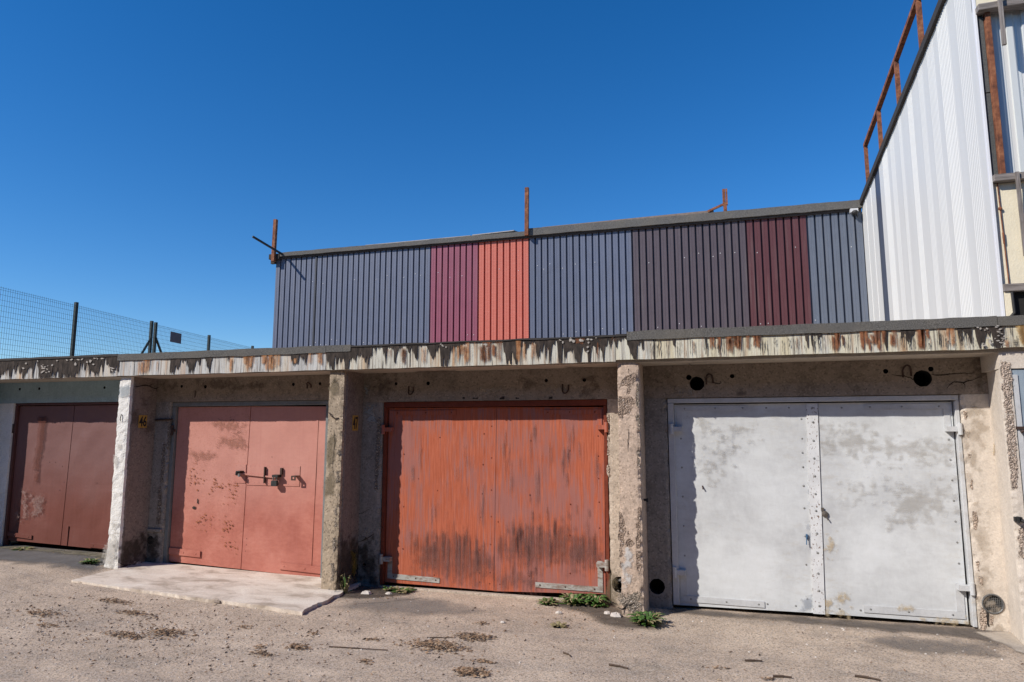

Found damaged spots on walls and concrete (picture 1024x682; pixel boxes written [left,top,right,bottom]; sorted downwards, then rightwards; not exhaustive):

rust [453,341,502,363]
rust [710,335,761,352]
rust [832,333,844,350]
rust [860,330,896,350]
rust [916,329,931,349]
rust [229,355,280,372]